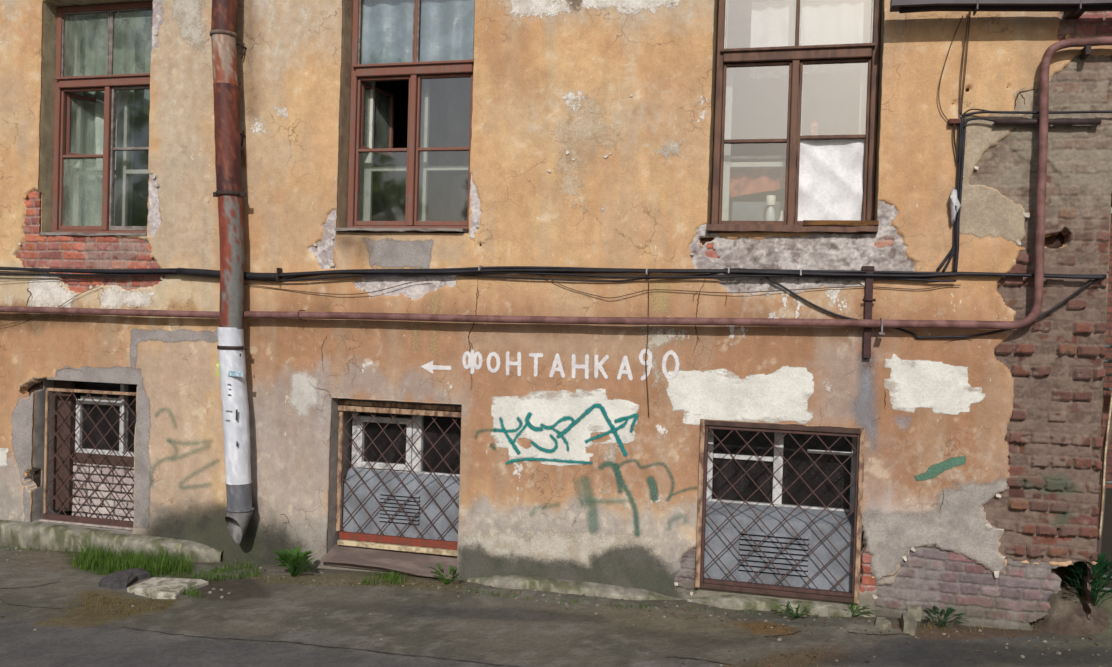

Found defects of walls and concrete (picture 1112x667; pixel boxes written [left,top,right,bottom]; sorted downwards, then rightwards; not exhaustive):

peeling [509,0,679,21]
flaking render [1057,11,1112,41]
flaking render [16,174,166,309]
spalling [689,201,915,318]
flaking render [859,55,1112,631]
damp [459,546,678,597]